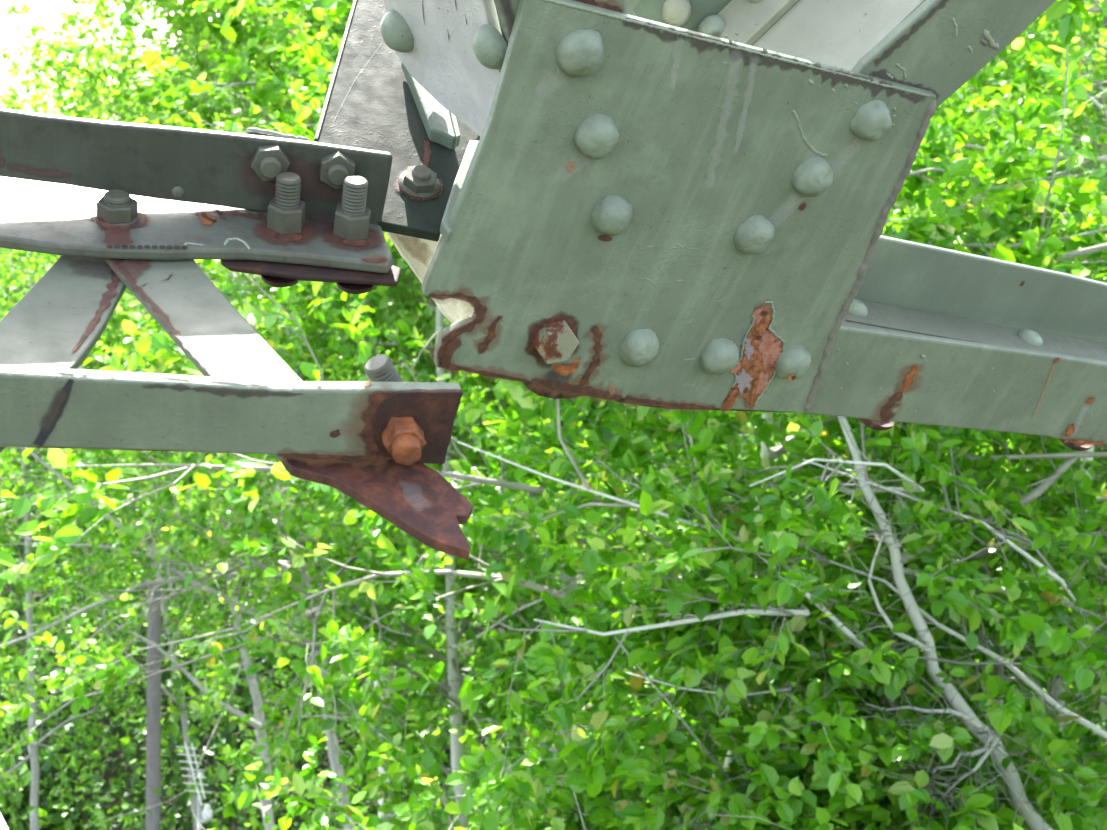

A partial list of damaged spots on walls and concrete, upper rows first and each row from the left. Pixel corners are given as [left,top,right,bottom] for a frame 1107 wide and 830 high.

rust [89,208,148,245]
rust [159,198,386,263]
rust [72,258,207,367]
rust [278,381,394,461]
rust [429,293,715,409]
peeling [721,301,785,410]
rust [881,354,926,422]